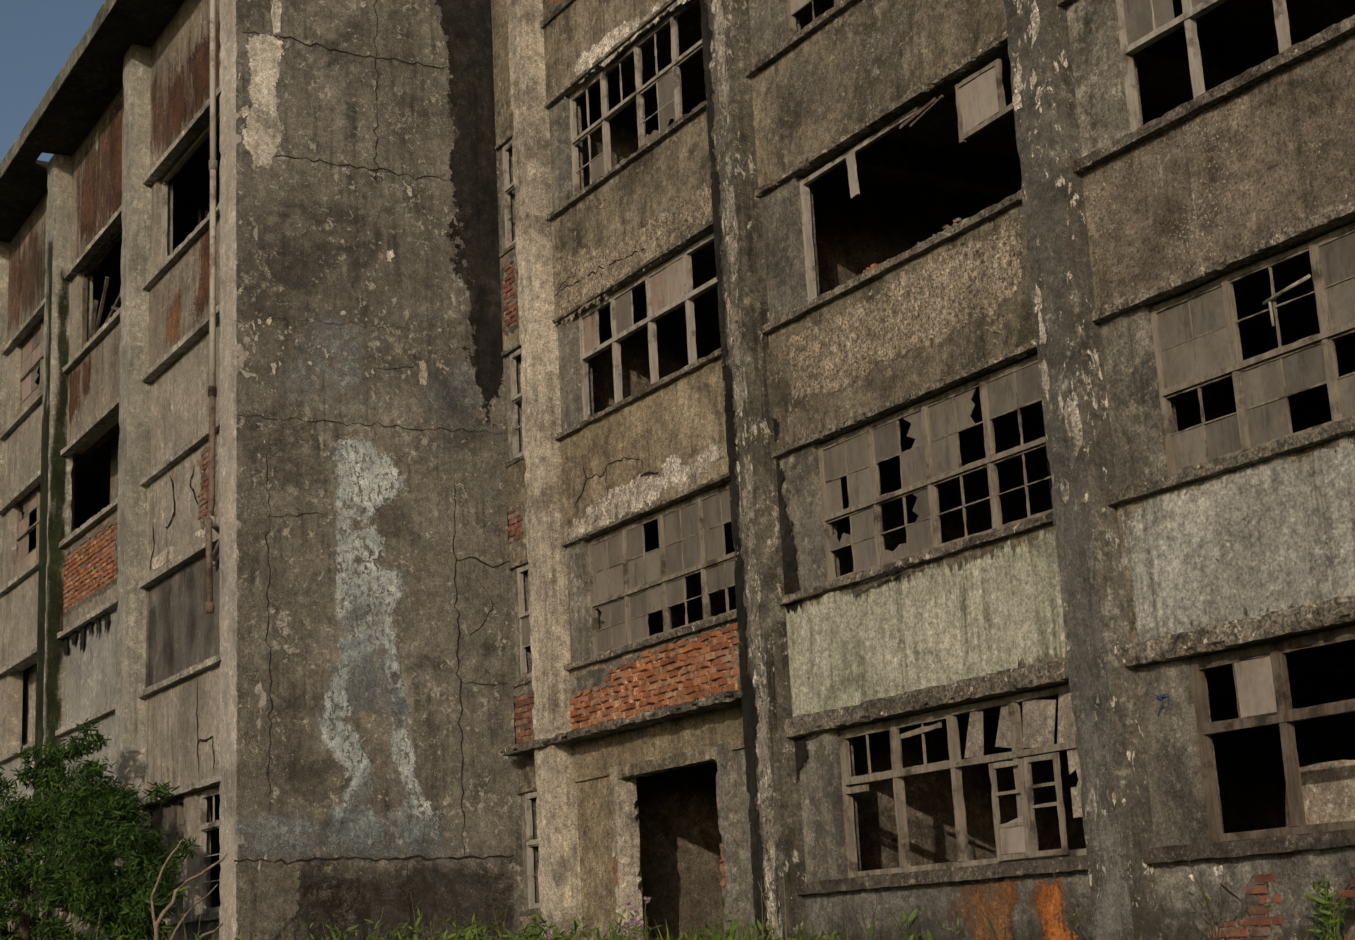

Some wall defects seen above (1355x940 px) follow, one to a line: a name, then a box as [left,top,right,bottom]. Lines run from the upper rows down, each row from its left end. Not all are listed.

rust [150,13,221,164]
peeling [242,0,286,170]
crack [244,0,449,185]
rust [72,101,124,264]
leakage [43,239,109,768]
flaking render [63,518,118,617]
crack [574,457,658,507]
flaking render [552,0,783,940]
rust [955,876,1077,940]
flaking render [1199,867,1355,940]